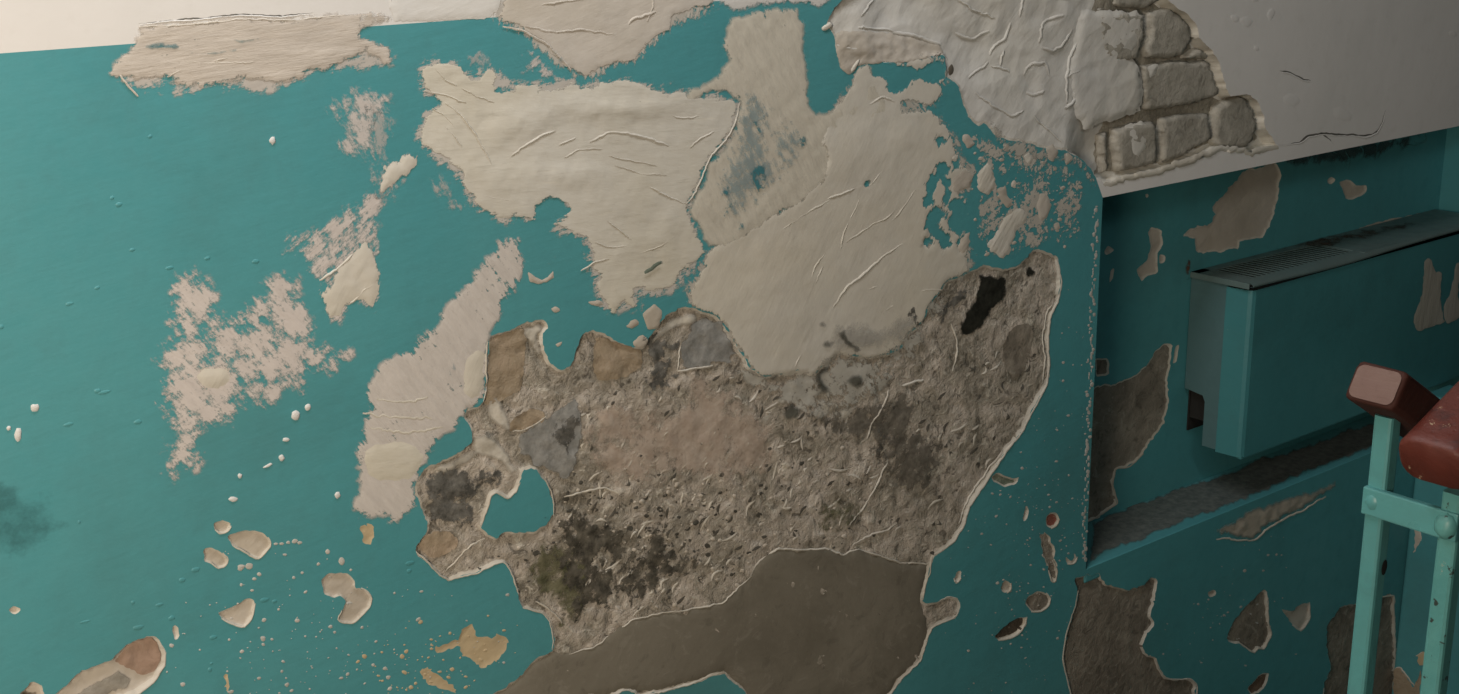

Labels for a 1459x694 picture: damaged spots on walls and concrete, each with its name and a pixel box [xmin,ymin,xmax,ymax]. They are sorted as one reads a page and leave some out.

spalling [822,0,1281,254]
crack [1278,112,1386,146]
peeling [415,249,1062,694]
peeling [1088,344,1179,522]
peeling [20,625,179,694]
peeling [995,512,1198,694]